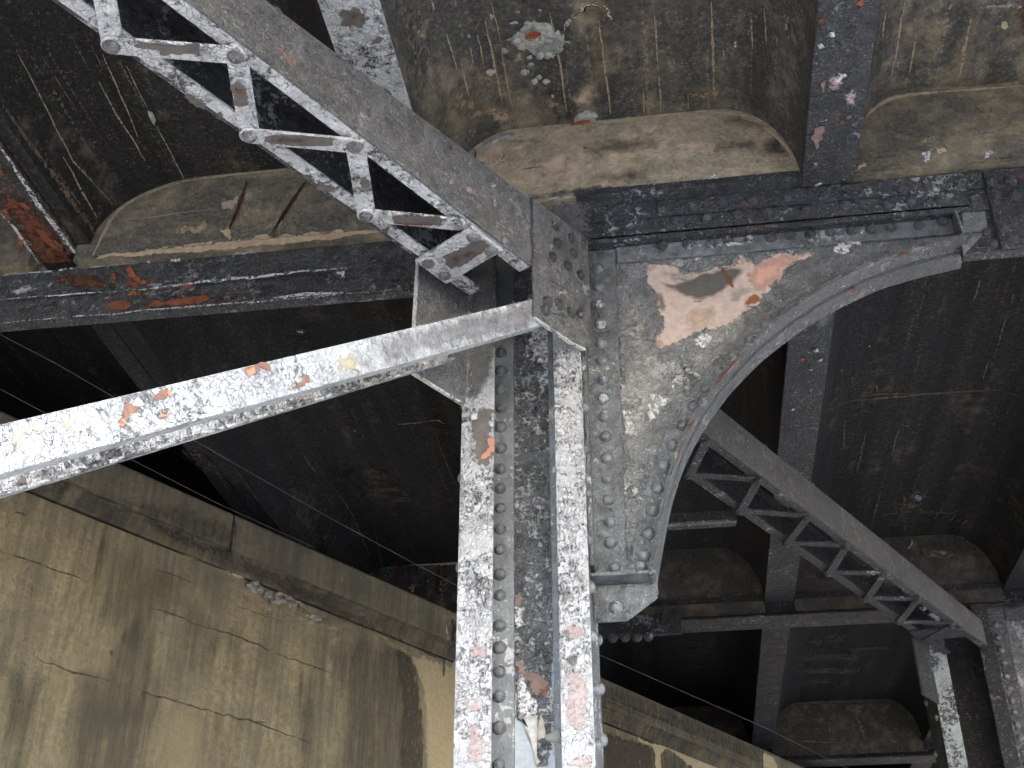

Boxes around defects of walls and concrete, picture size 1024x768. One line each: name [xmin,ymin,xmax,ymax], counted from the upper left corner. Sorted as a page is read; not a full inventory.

spalling [501,9,565,113]
peeling [820,73,856,106]
peeling [811,119,827,150]
rust [2,196,233,311]
peeling [834,231,863,254]
peeling [623,242,812,448]
crack [150,607,331,673]
spalling [216,568,333,628]
peeling [515,595,524,628]
crack [40,660,116,682]
crack [146,693,310,743]
peeling [515,655,587,768]